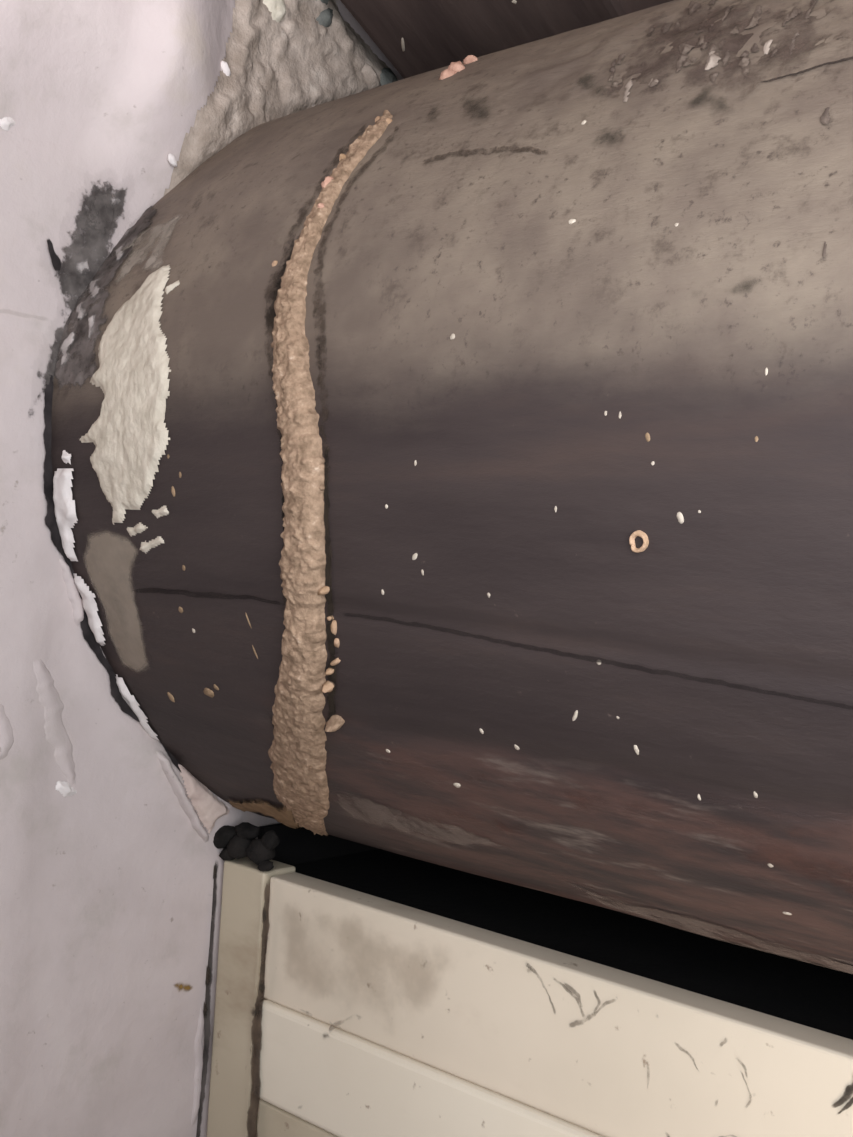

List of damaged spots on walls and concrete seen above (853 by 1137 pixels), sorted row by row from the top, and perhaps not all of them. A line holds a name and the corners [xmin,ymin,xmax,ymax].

peeling [607,0,823,102]
crack [763,57,853,82]
water stain [37,181,157,398]
spalling [127,506,169,554]
crack [137,588,277,604]
crack [345,613,853,709]